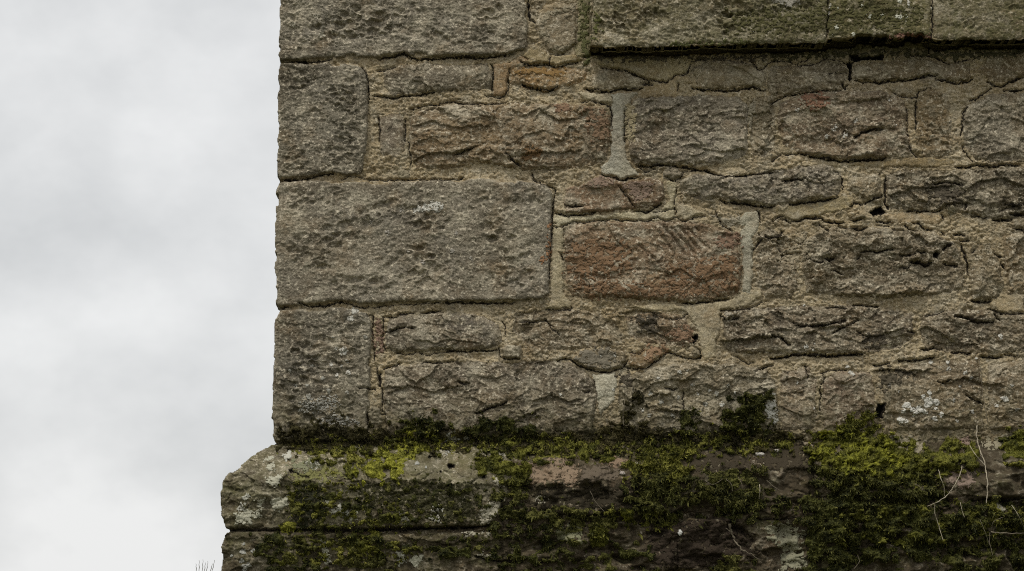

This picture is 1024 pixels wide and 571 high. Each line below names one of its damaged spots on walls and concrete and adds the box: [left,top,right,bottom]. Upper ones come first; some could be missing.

water stain [345,475,482,530]
water stain [528,479,760,571]